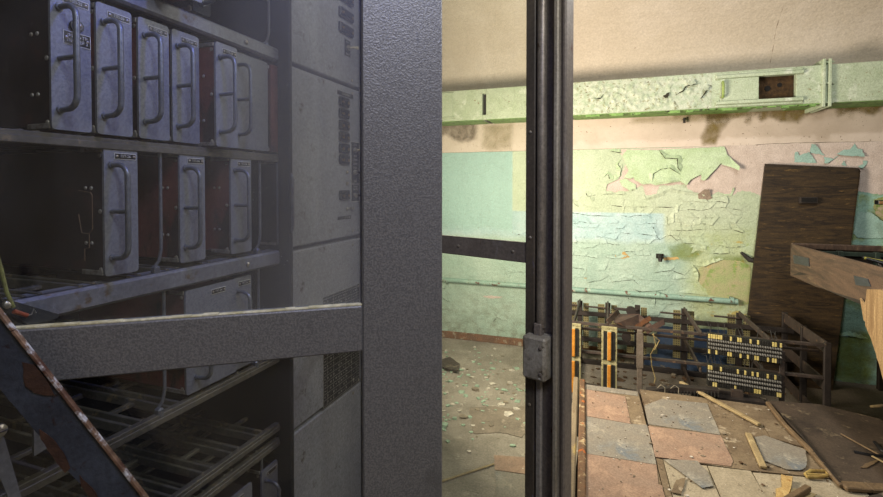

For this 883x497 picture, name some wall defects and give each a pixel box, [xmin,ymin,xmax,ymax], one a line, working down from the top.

peeling [501,264,526,273]
peeling [572,141,883,323]